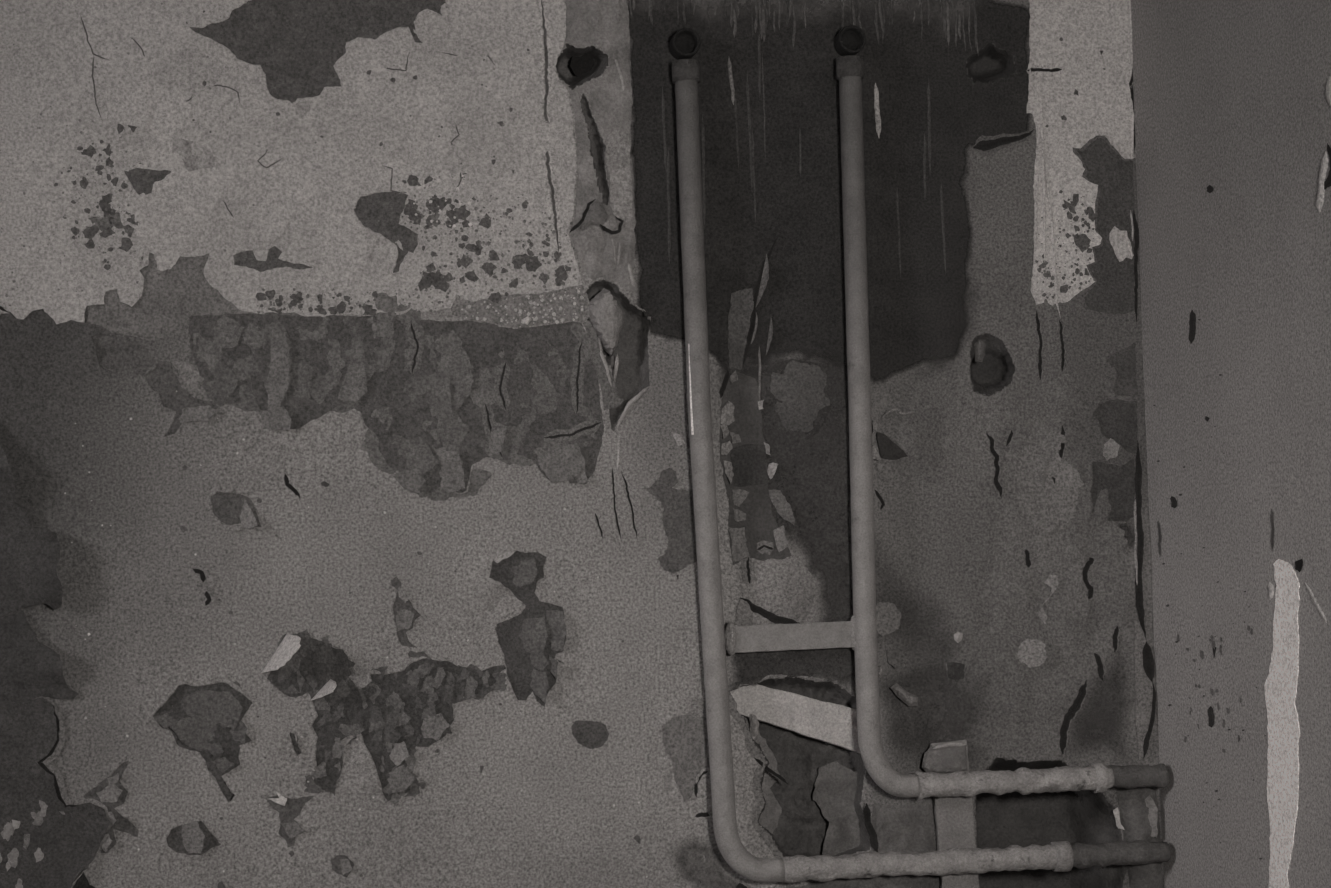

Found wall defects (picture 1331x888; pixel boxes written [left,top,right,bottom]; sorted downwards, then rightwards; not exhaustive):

crack [80,0,567,313]
peeling [1032,138,1135,315]
peeling [641,464,697,580]
spalling [963,327,1019,404]
crack [985,430,1016,498]
crack [1021,549,1036,568]
crack [1051,425,1070,484]
crack [1055,440,1146,755]
peeling [1076,340,1155,532]
peeling [77,534,579,869]
peeling [656,695,710,807]
spalling [728,674,936,858]